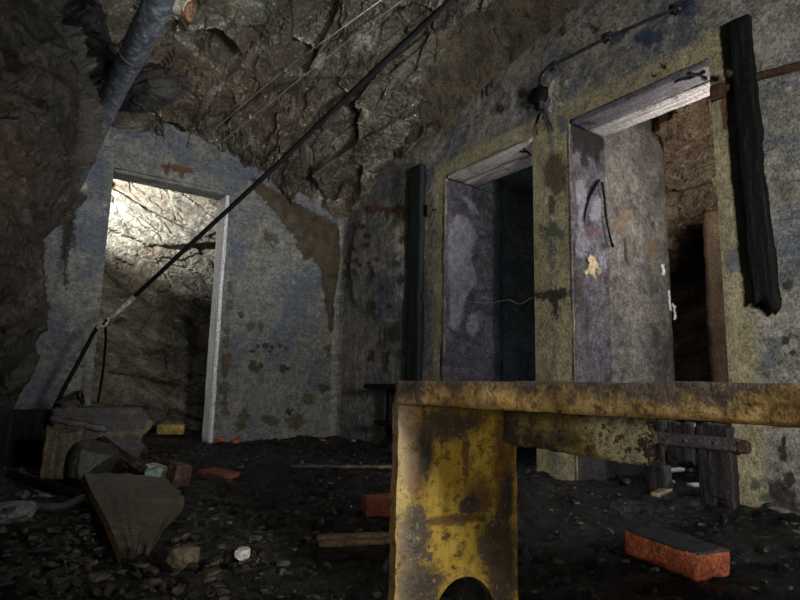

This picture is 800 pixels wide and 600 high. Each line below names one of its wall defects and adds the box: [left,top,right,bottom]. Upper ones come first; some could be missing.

rust [161,163,193,179]
leakage [535,287,571,320]